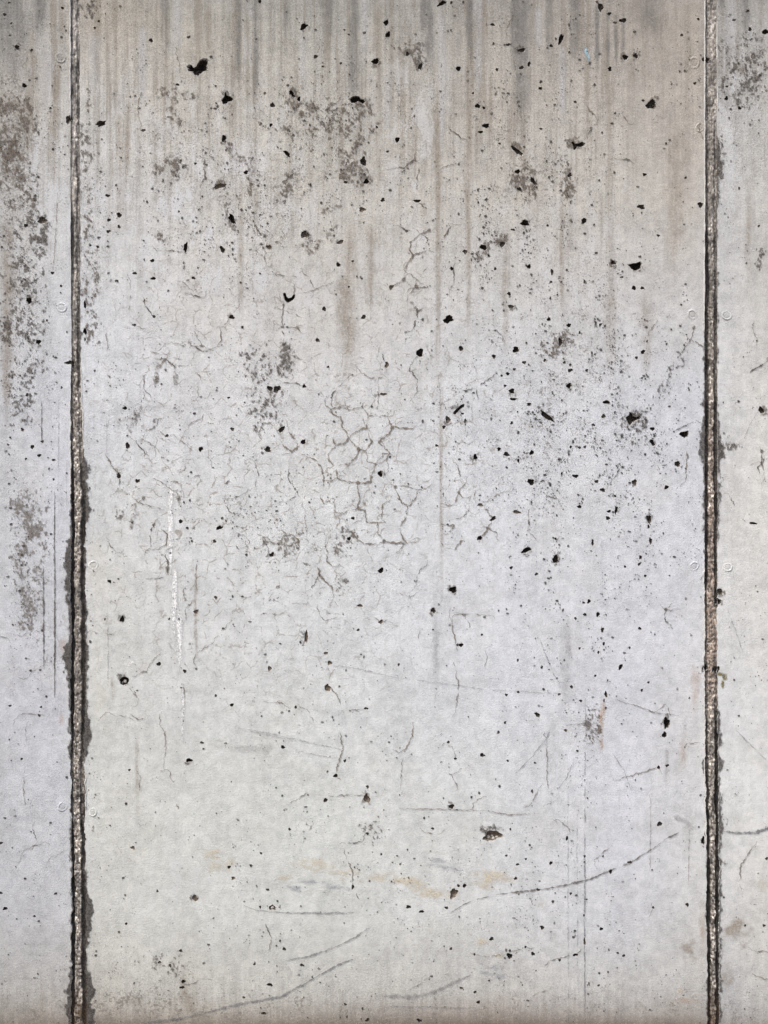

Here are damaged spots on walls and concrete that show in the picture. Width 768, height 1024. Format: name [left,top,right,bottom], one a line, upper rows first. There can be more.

crack [254,223,326,386]
crack [387,155,456,332]
crack [105,278,228,623]
crack [224,354,507,621]